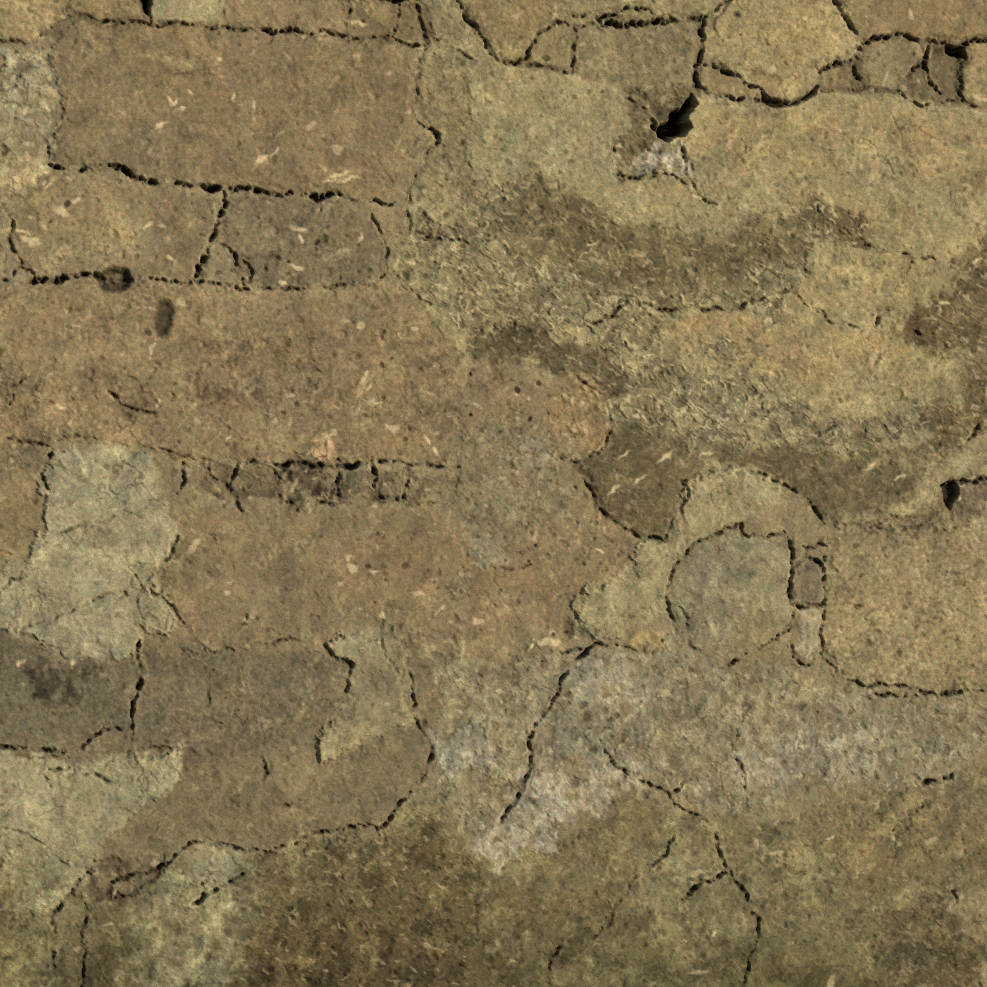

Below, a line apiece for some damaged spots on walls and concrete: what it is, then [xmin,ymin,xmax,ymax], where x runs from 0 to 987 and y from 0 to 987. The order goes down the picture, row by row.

crack [0,0,763,305]
spalling [605,77,701,185]
crack [818,0,987,112]
crack [587,243,936,329]
peeling [0,440,185,668]
crack [0,434,459,512]
peeling [311,617,421,768]
spalling [387,166,987,649]
crack [499,374,987,832]
spalling [0,738,509,987]
crack [547,835,676,985]
crack [599,740,761,987]